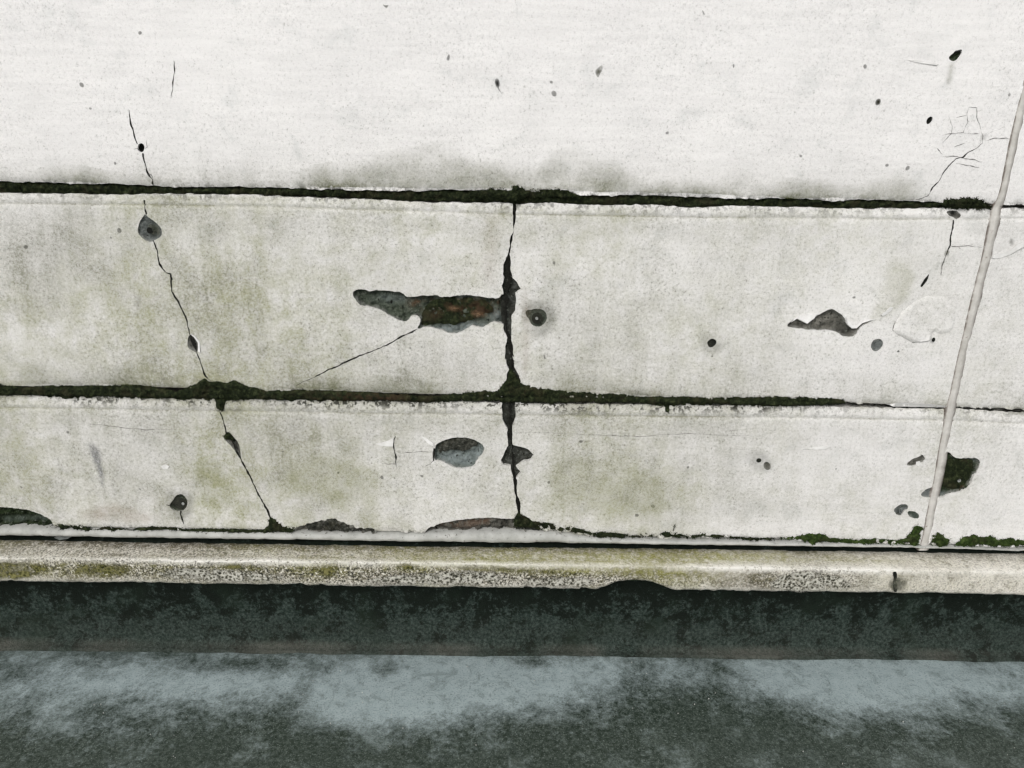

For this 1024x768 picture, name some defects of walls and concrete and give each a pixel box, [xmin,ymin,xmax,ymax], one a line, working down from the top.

crack [129,112,153,214]
crack [916,107,1008,200]
spalling [138,215,162,242]
crack [153,240,211,381]
spalling [353,289,508,333]
spalling [787,307,893,337]
crack [296,329,417,386]
crack [501,204,694,531]
crack [220,412,271,517]
spalling [433,437,484,468]
spalling [921,452,980,497]
spalling [0,507,53,526]